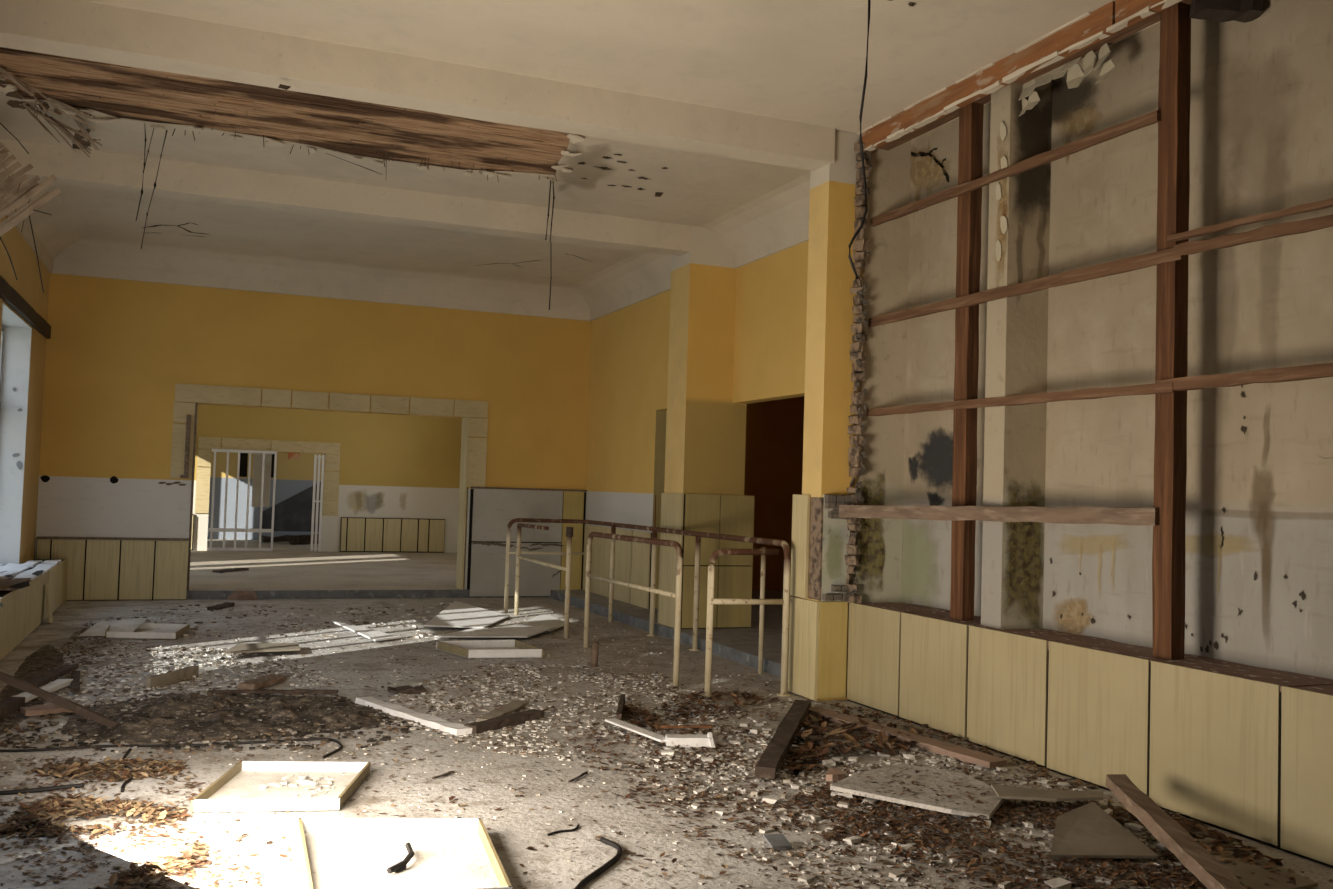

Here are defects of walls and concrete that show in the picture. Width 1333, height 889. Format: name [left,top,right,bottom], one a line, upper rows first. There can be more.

flaking render [0,47,585,183]
water stain [577,154,668,190]
flaking render [809,143,873,603]
water stain [857,476,885,584]
water stain [1006,486,1043,625]
water stain [1057,600,1089,634]